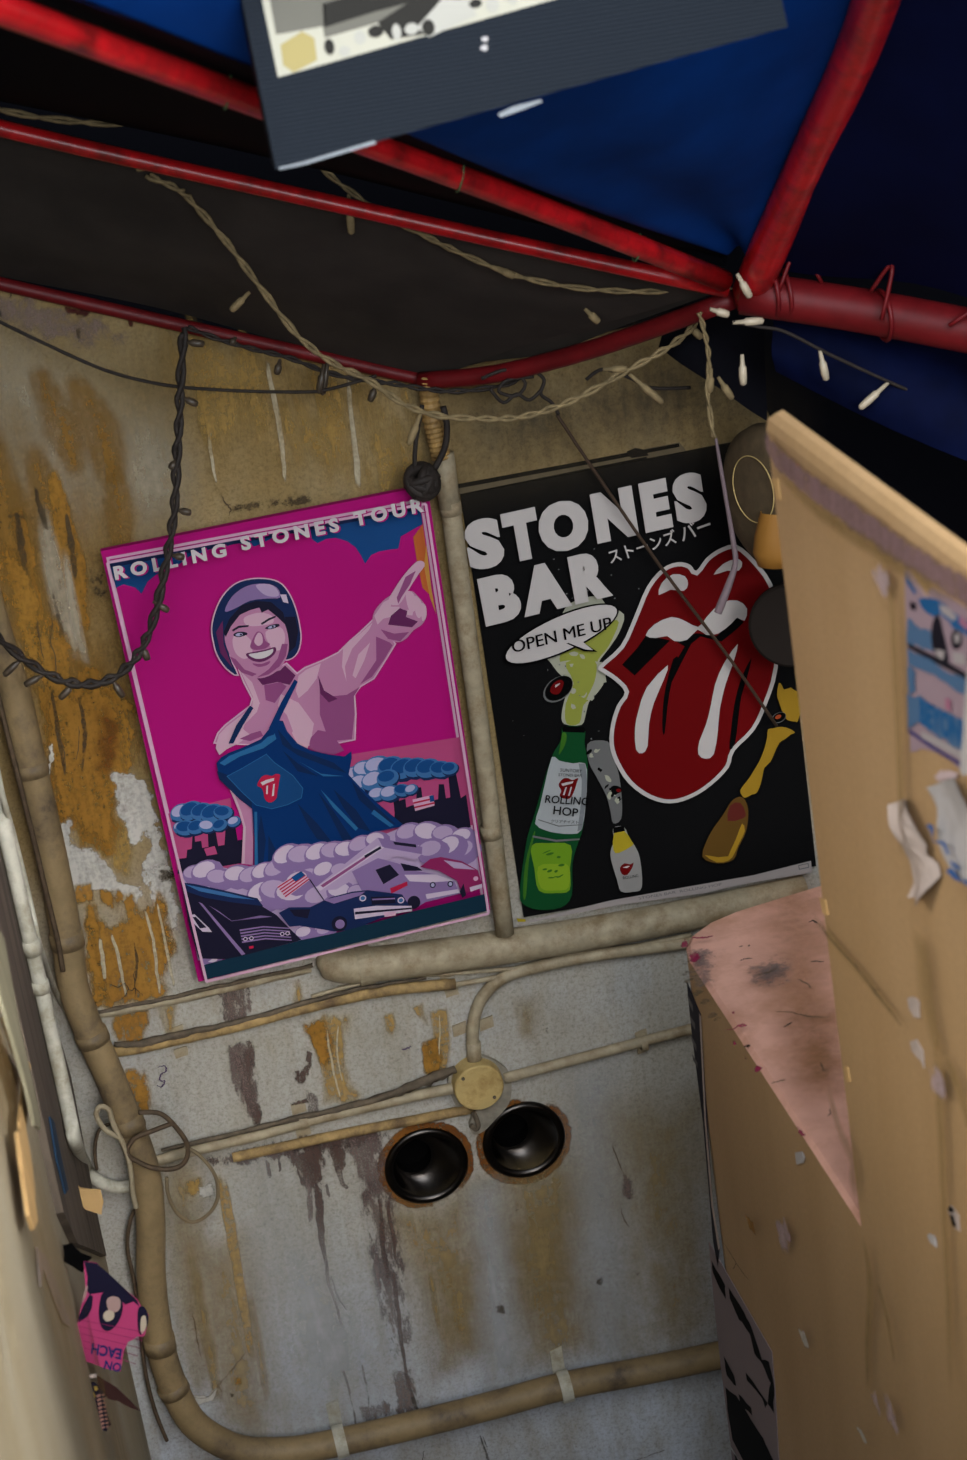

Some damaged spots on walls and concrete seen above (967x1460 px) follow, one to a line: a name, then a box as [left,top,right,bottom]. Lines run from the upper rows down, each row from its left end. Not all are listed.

peeling [61,772,182,930]
rust [304,1016,358,1102]
rust [414,1005,450,1074]